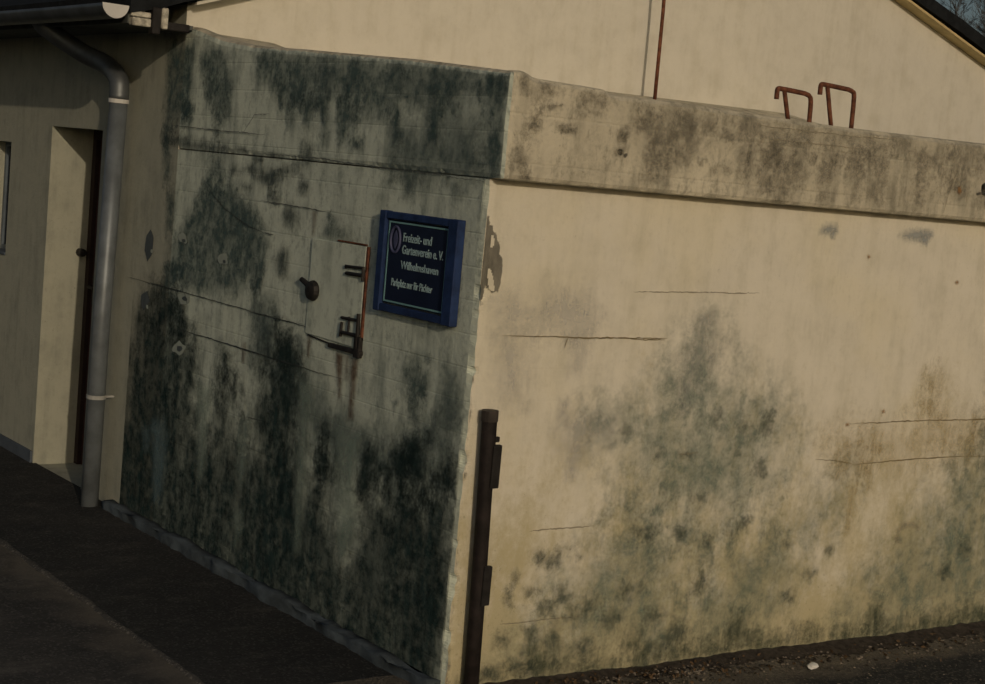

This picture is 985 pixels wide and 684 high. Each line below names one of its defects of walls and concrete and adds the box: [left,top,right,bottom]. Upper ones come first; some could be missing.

damp [164,39,234,186]
damp [257,51,506,194]
damp [637,109,714,175]
peeling [480,217,503,301]
rust [337,355,356,415]
damp [257,317,457,497]